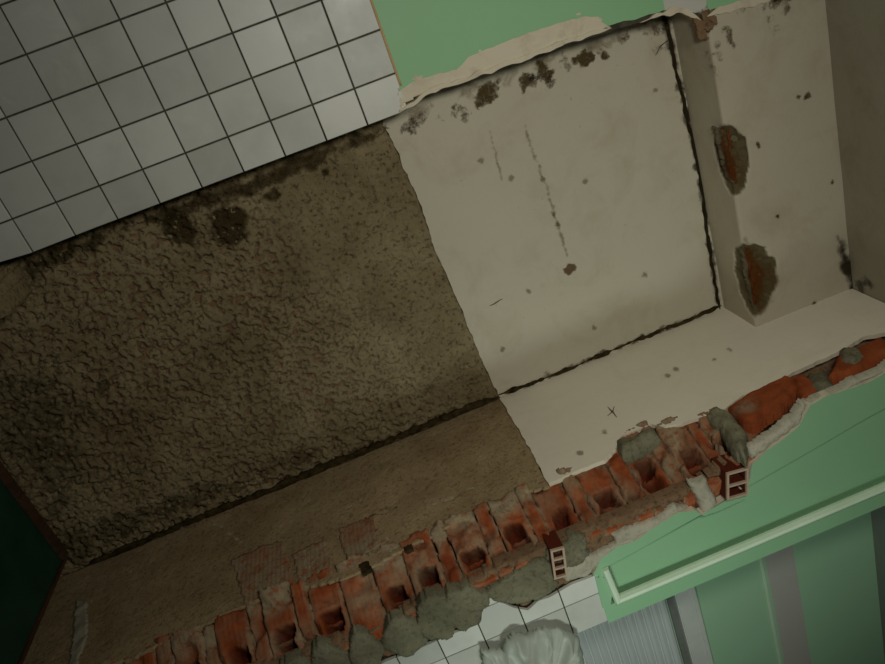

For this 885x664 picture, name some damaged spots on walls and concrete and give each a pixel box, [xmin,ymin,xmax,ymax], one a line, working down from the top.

water stain [475,82,499,110]
peeling [397,12,611,112]
water stain [519,61,555,93]
water stain [562,47,609,67]
water stain [144,150,333,245]
spalling [712,126,742,185]
crack [88,15,722,565]
spalling [99,337,885,664]